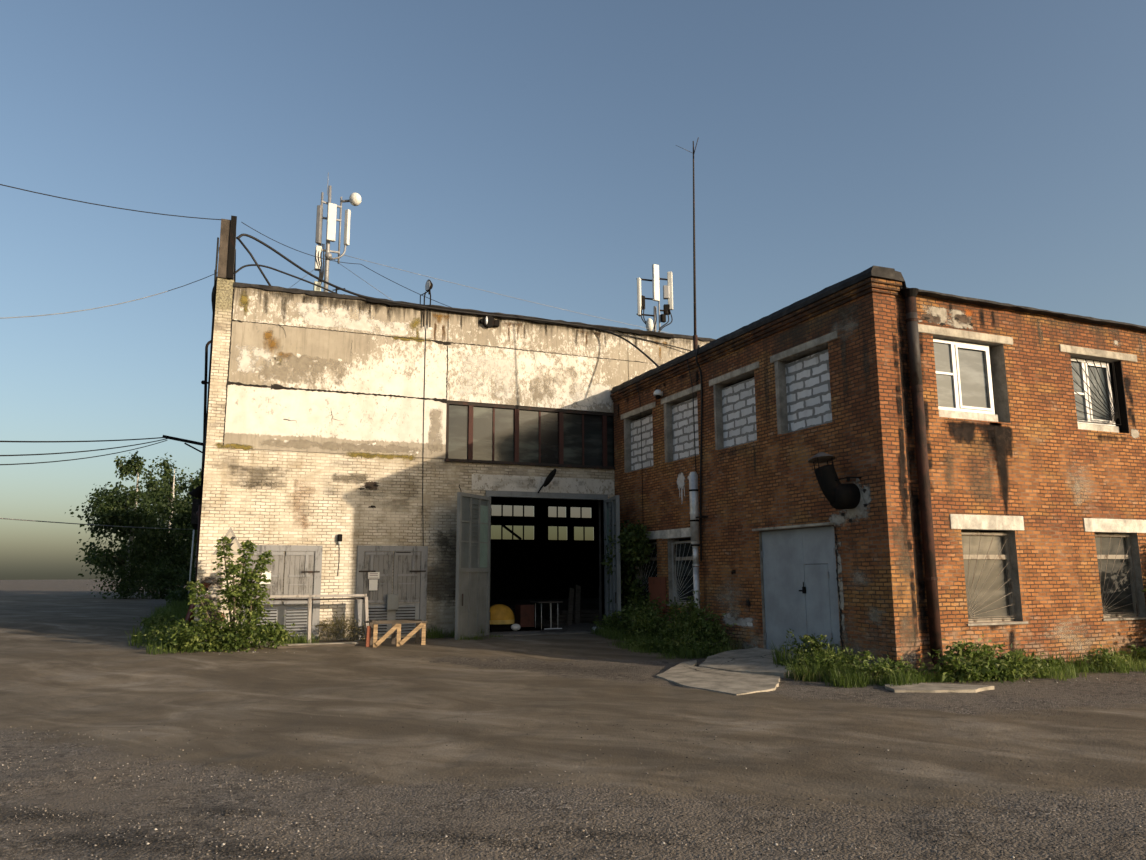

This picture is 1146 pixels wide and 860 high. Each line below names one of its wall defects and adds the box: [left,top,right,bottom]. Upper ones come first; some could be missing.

damp [265,292,392,317]
peeling [298,303,451,345]
spalling [918,306,973,329]
peeling [236,346,342,392]
damp [924,401,932,469]
damp [333,474,366,483]
damp [893,317,927,639]
damp [949,422,1012,514]
spalling [829,478,871,526]